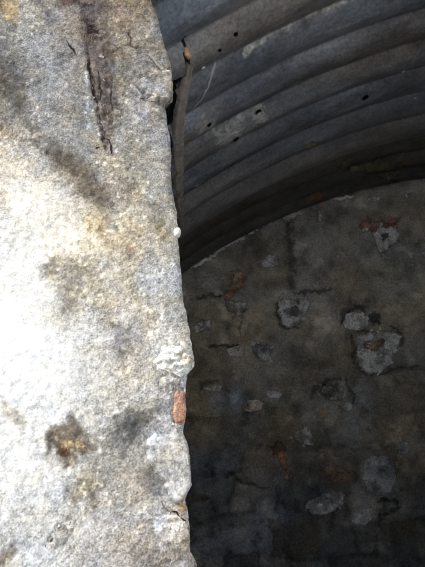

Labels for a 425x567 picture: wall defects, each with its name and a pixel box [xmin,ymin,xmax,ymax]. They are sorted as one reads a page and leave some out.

crack [66,11,112,154]
flaking render [359,216,401,256]
flaking render [277,295,310,329]
flaking render [343,312,402,375]
flaking render [362,456,396,496]
flaking render [305,491,345,515]